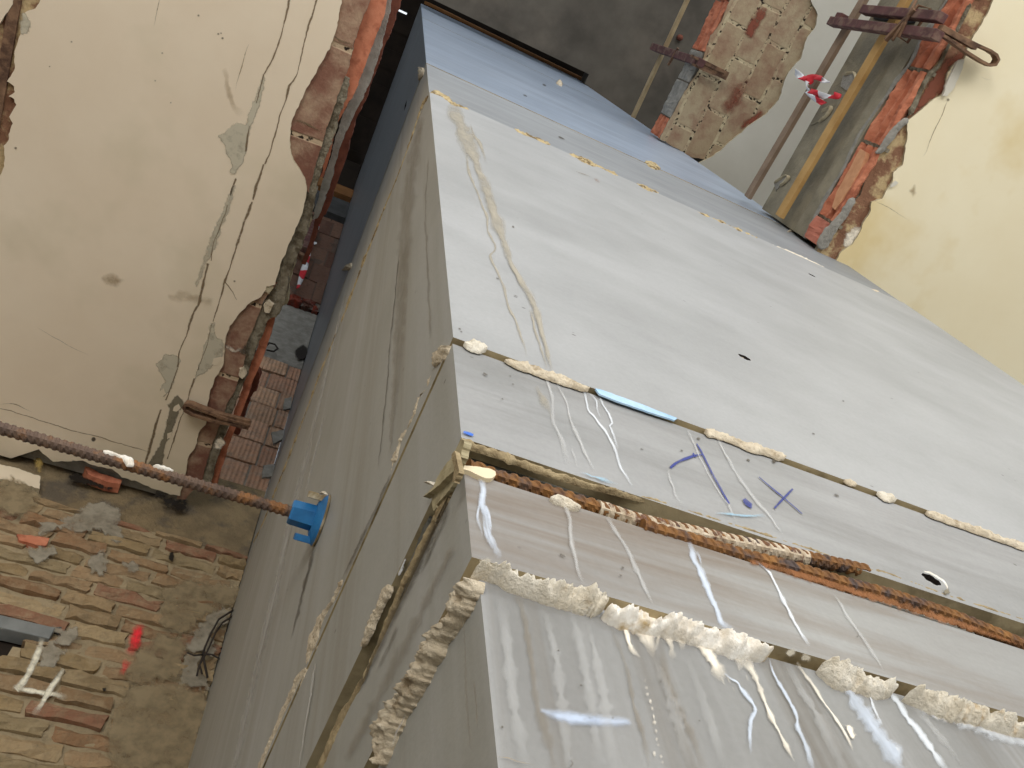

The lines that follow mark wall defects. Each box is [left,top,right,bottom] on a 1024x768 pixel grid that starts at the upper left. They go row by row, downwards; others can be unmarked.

flaking render [0,0,40,175]
spalling [803,0,991,259]
crack [4,0,317,464]
spalling [155,0,401,511]
spalling [69,473,112,490]
leakage [691,551,722,623]
leakage [762,566,803,636]
rust [752,560,1010,642]
leakage [698,646,721,672]
leakage [732,664,789,751]
leakage [772,670,805,742]
leakage [892,695,940,762]